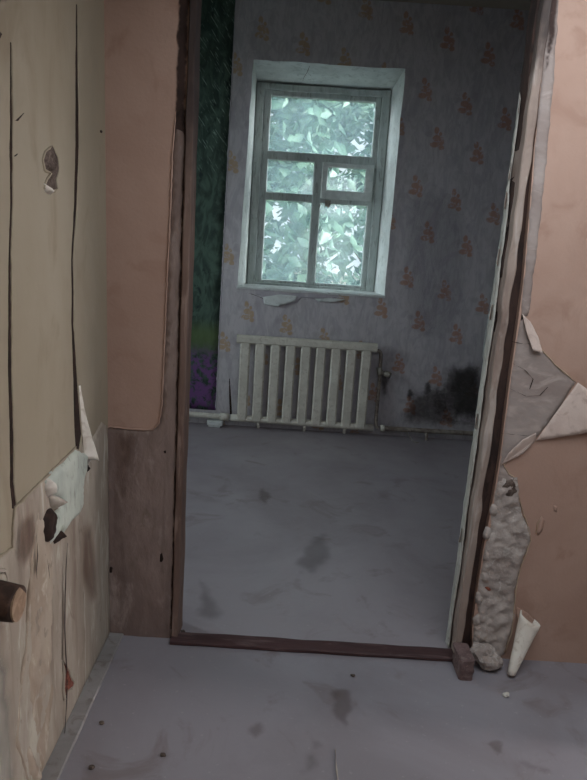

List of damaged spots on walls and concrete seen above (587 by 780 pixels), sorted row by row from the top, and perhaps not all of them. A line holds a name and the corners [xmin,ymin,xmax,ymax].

peeling [0,109,186,780]
damp [408,368,478,423]
peeling [472,0,587,676]